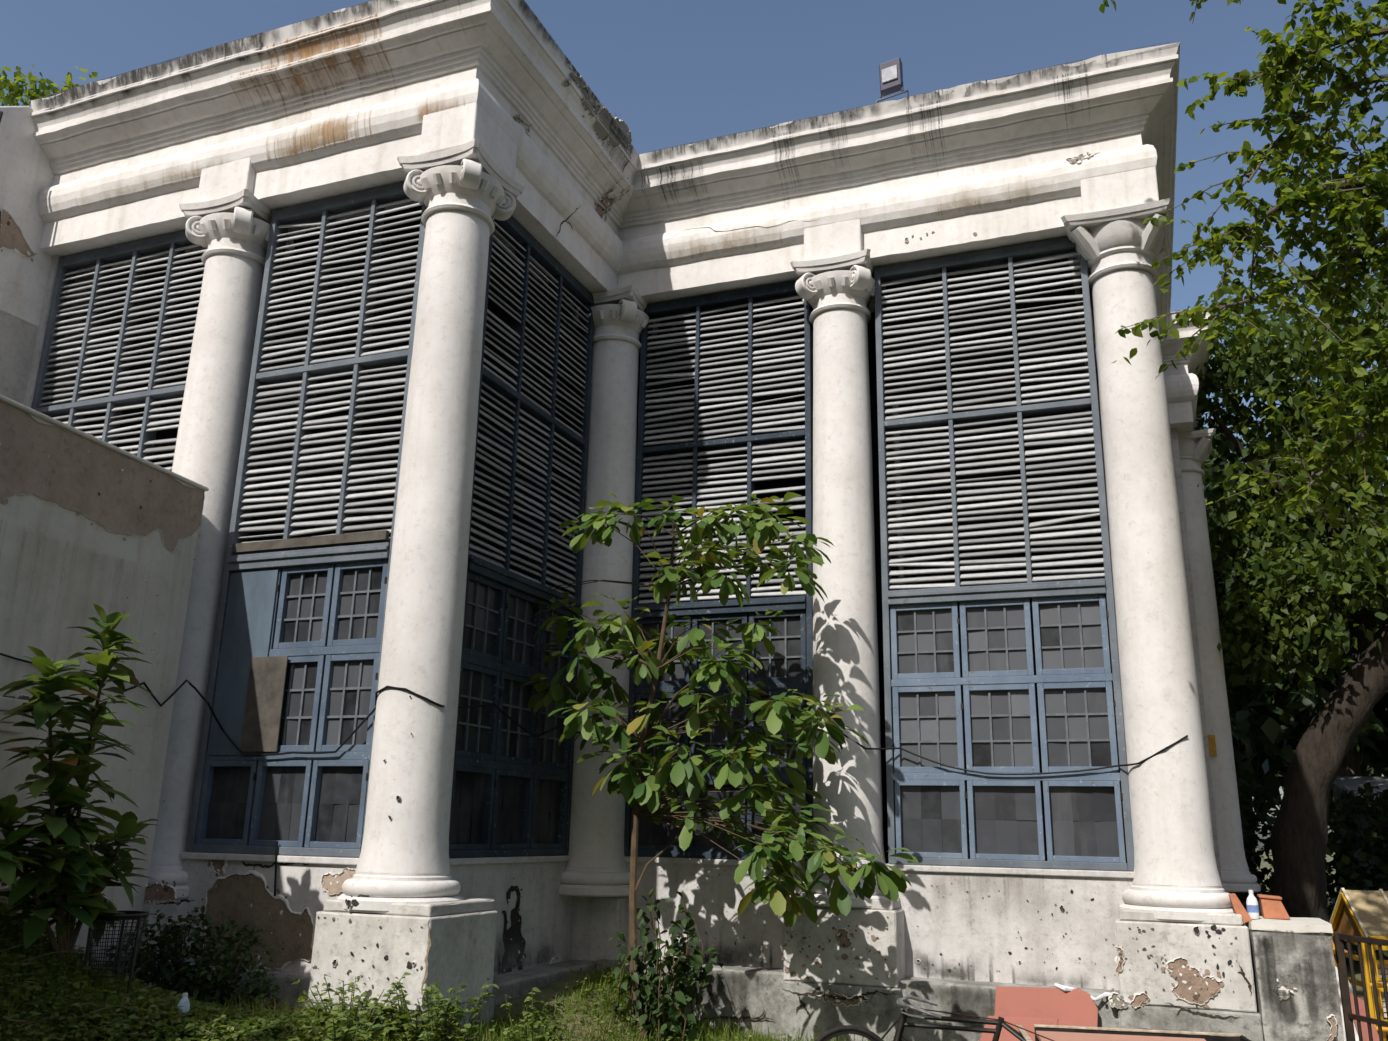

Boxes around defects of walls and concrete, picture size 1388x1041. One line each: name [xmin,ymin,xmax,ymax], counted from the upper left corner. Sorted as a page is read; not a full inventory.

corrosion [251,13,378,93]
damp [641,106,875,190]
peeling [0,209,37,262]
peeling [0,401,205,552]
peeling [143,880,184,905]
spalling [201,860,389,1000]
crack [699,986,897,1022]
spalling [1078,893,1252,1009]
damp [1261,932,1326,1021]